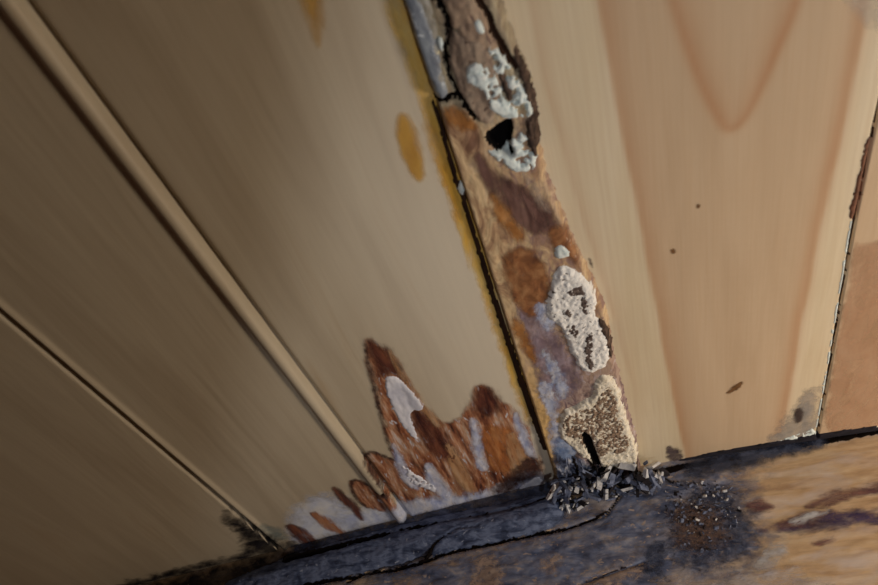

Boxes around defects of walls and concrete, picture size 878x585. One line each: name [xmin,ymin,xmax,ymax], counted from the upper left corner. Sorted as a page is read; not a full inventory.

spalling [404,0,533,124]
peeling [488,132,538,172]
crack [431,0,547,450]
peeling [554,245,570,259]
leakage [126,0,600,585]
peeling [385,376,424,439]
peeling [402,466,436,492]
peeling [520,477,546,489]
leakage [308,446,878,585]